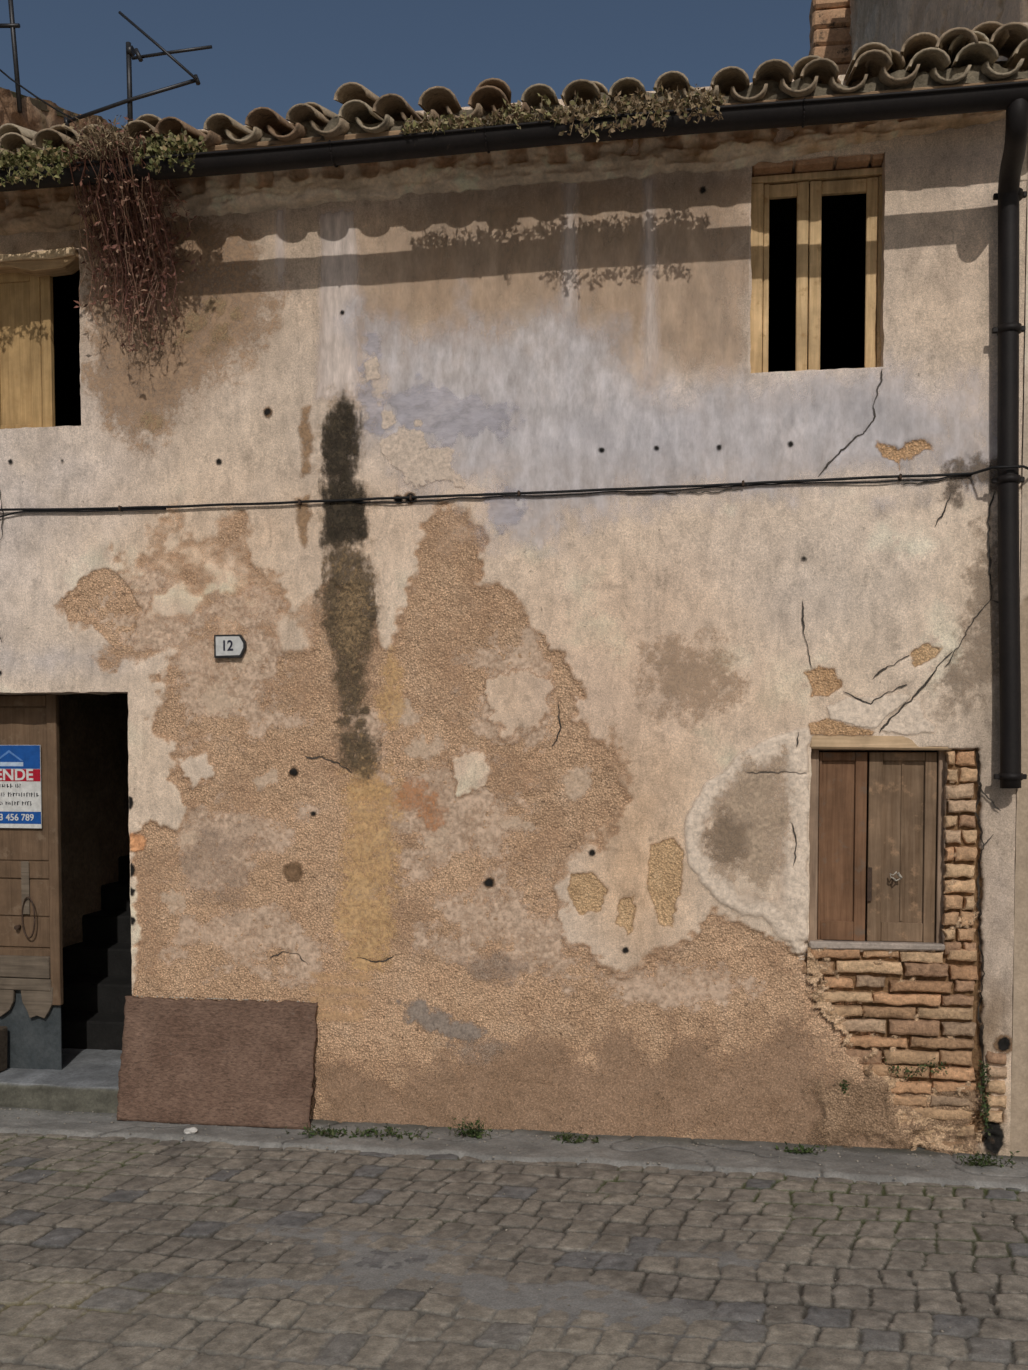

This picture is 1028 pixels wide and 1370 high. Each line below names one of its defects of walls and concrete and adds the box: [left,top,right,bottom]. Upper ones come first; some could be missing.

water stain [75,216,285,448]
water stain [296,212,382,779]
peeling [364,316,995,544]
crack [625,488,739,496]
crack [801,601,813,669]
crack [818,370,883,477]
crack [843,491,998,732]
crack [901,479,951,526]
spalling [58,503,1012,1156]